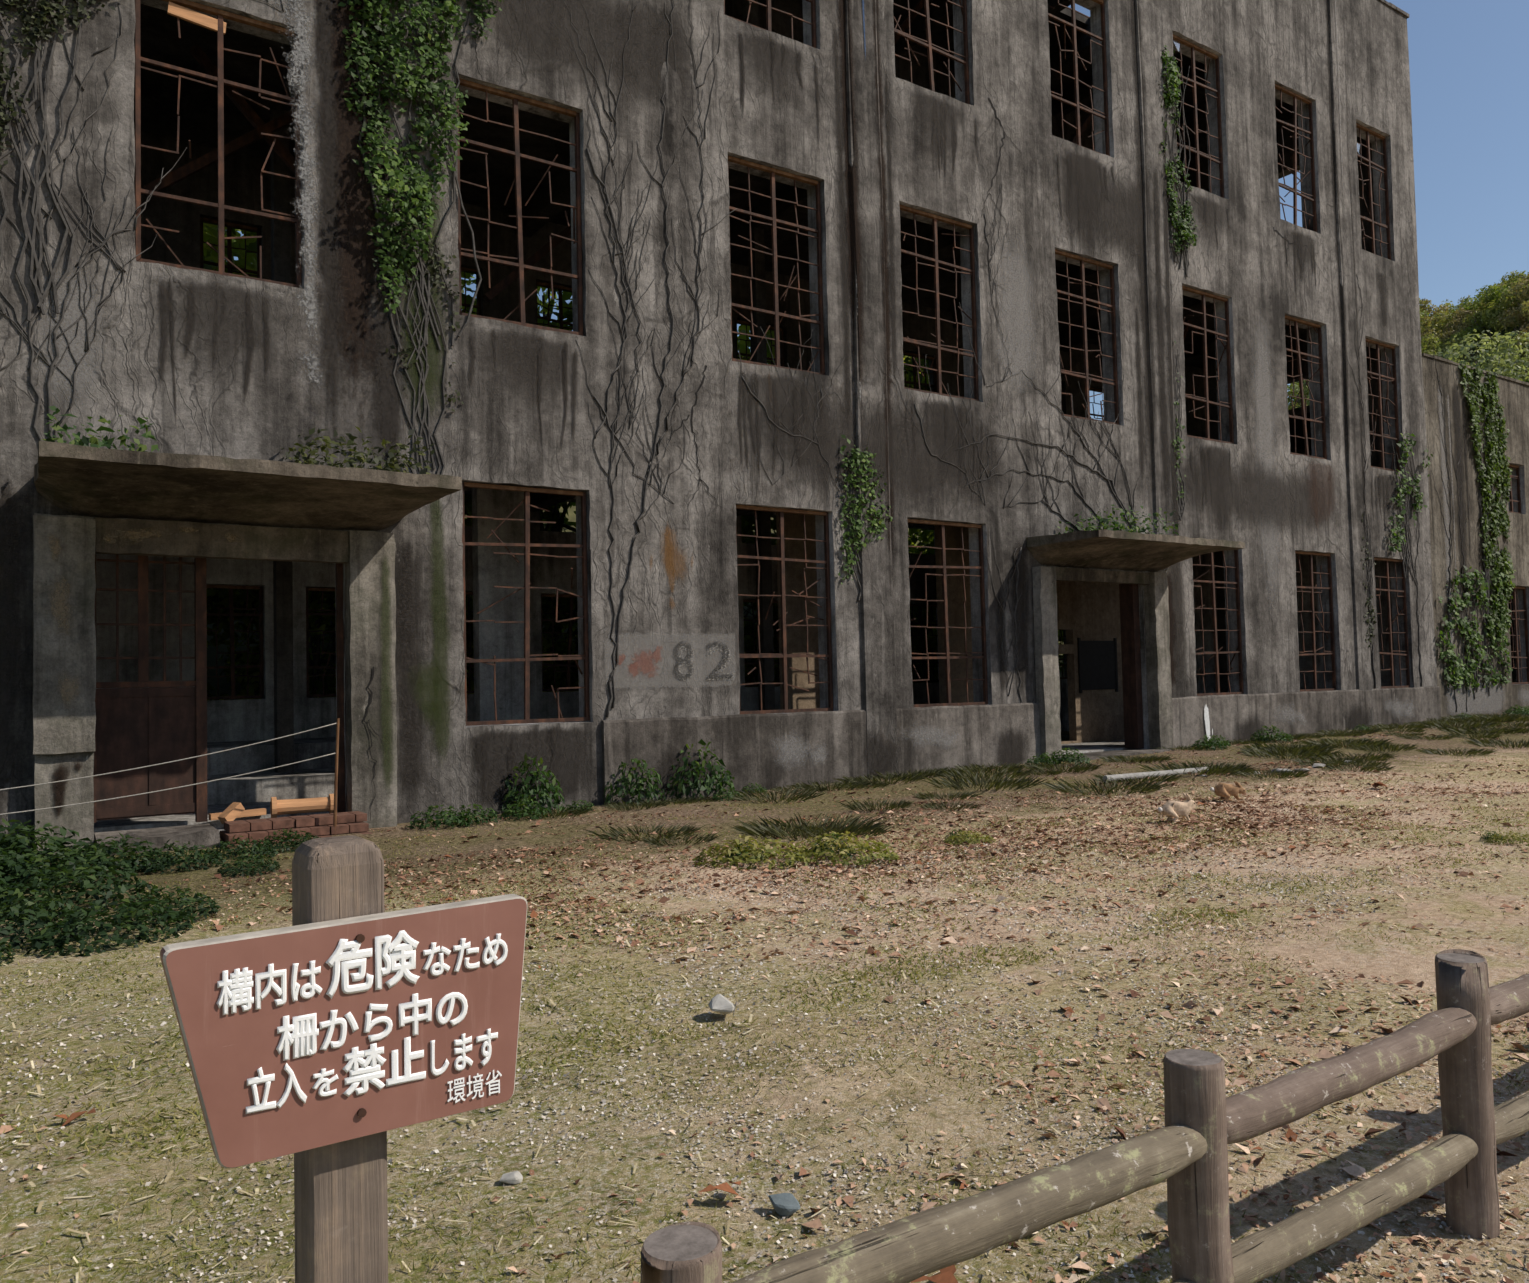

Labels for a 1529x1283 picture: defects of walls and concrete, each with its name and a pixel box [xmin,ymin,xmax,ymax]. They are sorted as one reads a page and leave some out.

water stain [159,282,270,415]
water stain [277,0,401,453]
water stain [469,331,578,444]
water stain [738,0,996,548]